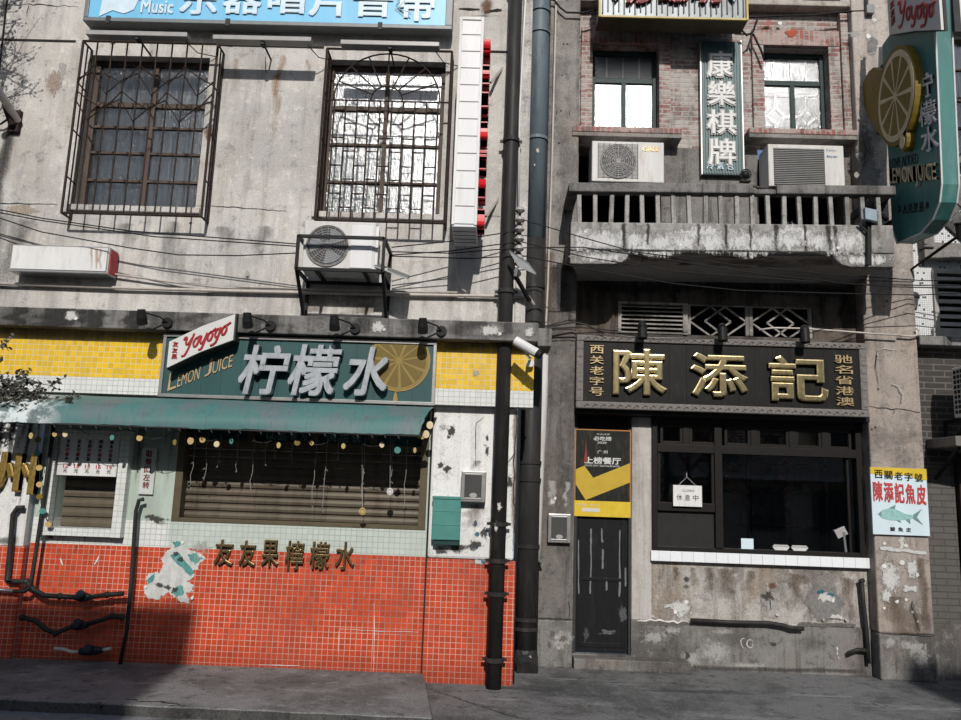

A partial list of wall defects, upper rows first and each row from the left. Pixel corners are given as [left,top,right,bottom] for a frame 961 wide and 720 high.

damp [587,223,838,266]
damp [0,423,33,462]
peeling [435,526,498,554]
peeling [584,594,747,641]
peeling [761,583,780,616]
spalling [792,614,856,627]
peeling [878,542,921,632]